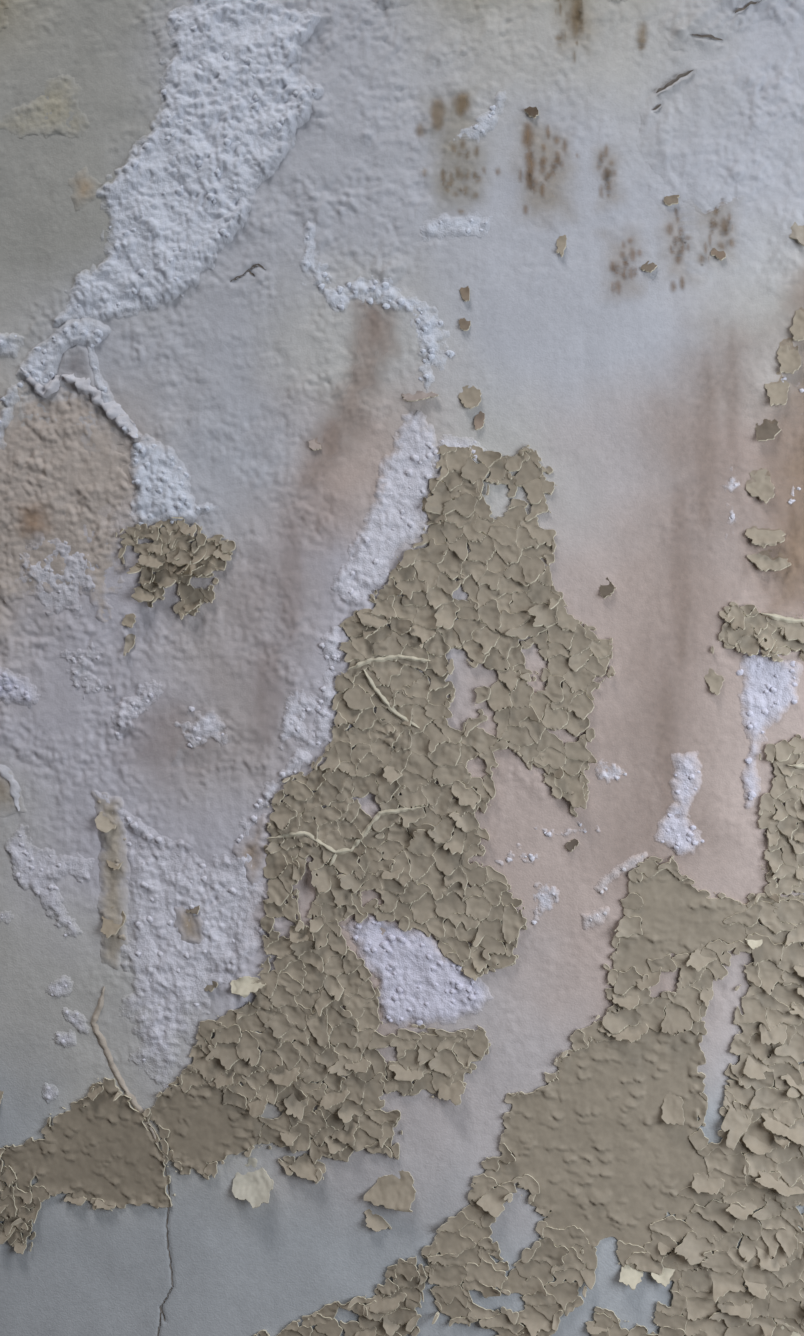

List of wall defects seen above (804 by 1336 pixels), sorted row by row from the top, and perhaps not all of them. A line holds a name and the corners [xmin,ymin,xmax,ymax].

damp [0,0,325,528]
damp [15,534,99,620]
damp [297,218,487,605]
peeling [704,602,804,695]
peeling [746,468,775,504]
peeling [745,526,791,572]
damp [3,824,95,938]
damp [118,626,342,1098]
peeling [0,345,616,1255]
damp [340,914,494,1029]
peeling [254,734,804,1336]
crack [158,1163,174,1334]